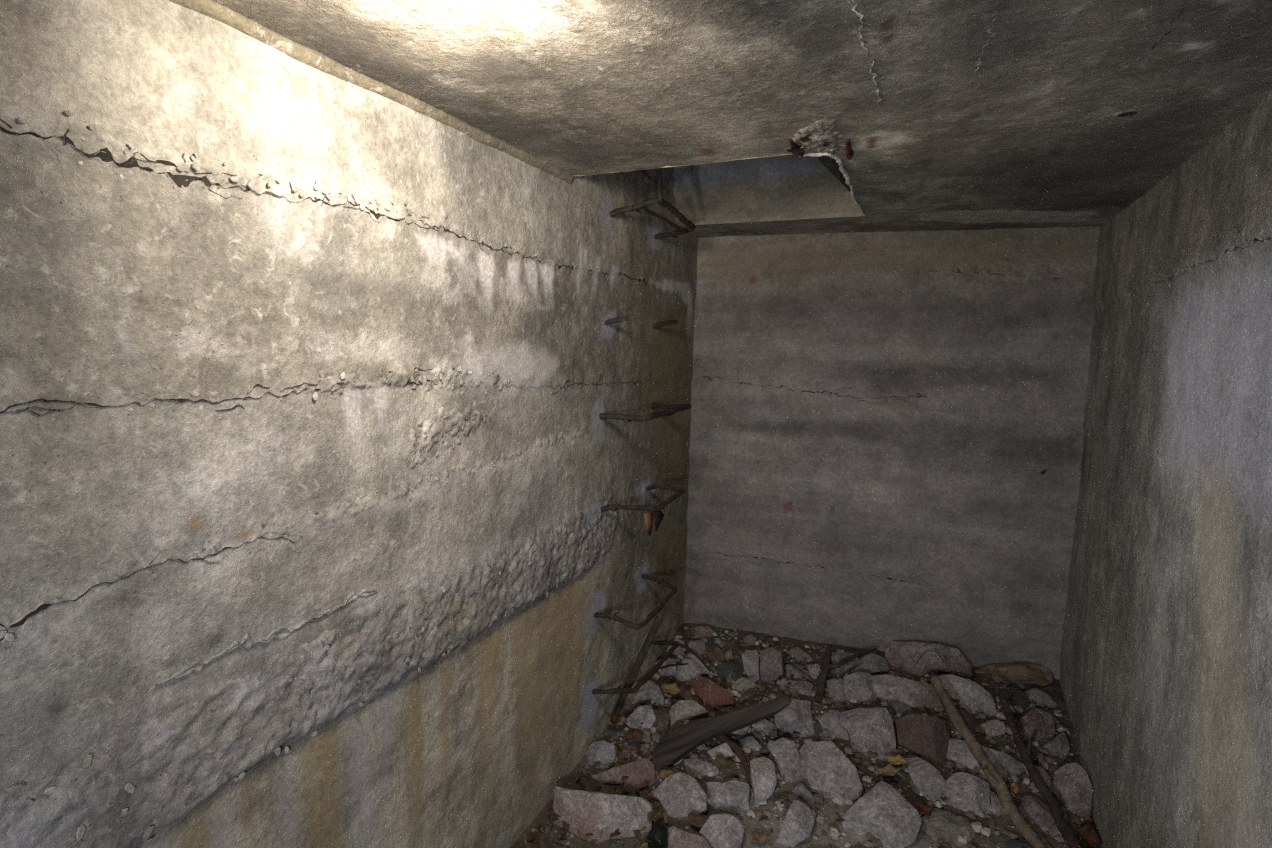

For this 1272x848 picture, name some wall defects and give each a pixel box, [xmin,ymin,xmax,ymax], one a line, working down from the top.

crack [0,119,648,285]
spalling [787,119,866,217]
crack [1155,227,1272,287]
crack [0,367,927,416]
rust [644,498,677,536]
crack [0,534,300,641]